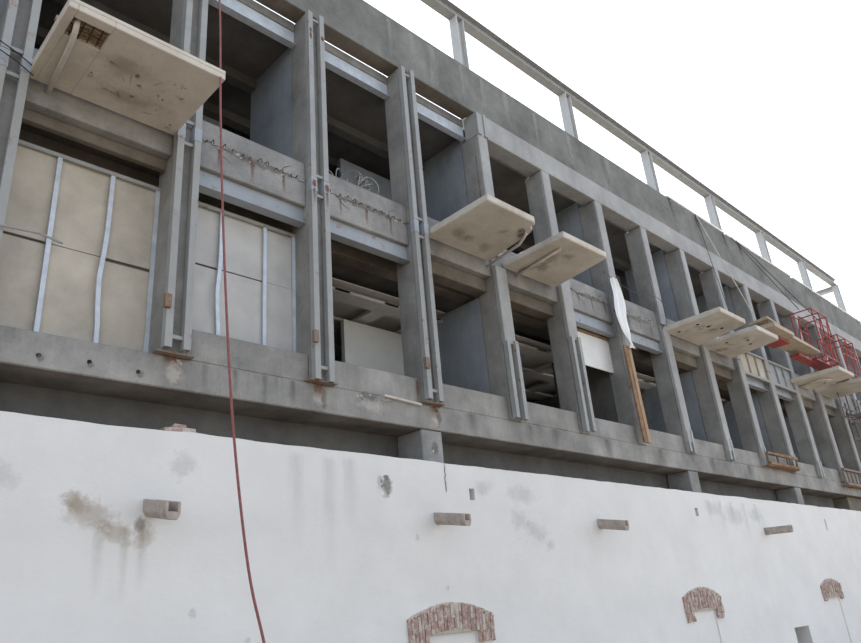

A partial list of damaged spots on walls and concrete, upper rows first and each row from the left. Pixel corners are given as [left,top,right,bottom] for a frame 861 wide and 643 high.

peeling [377,474,391,498]